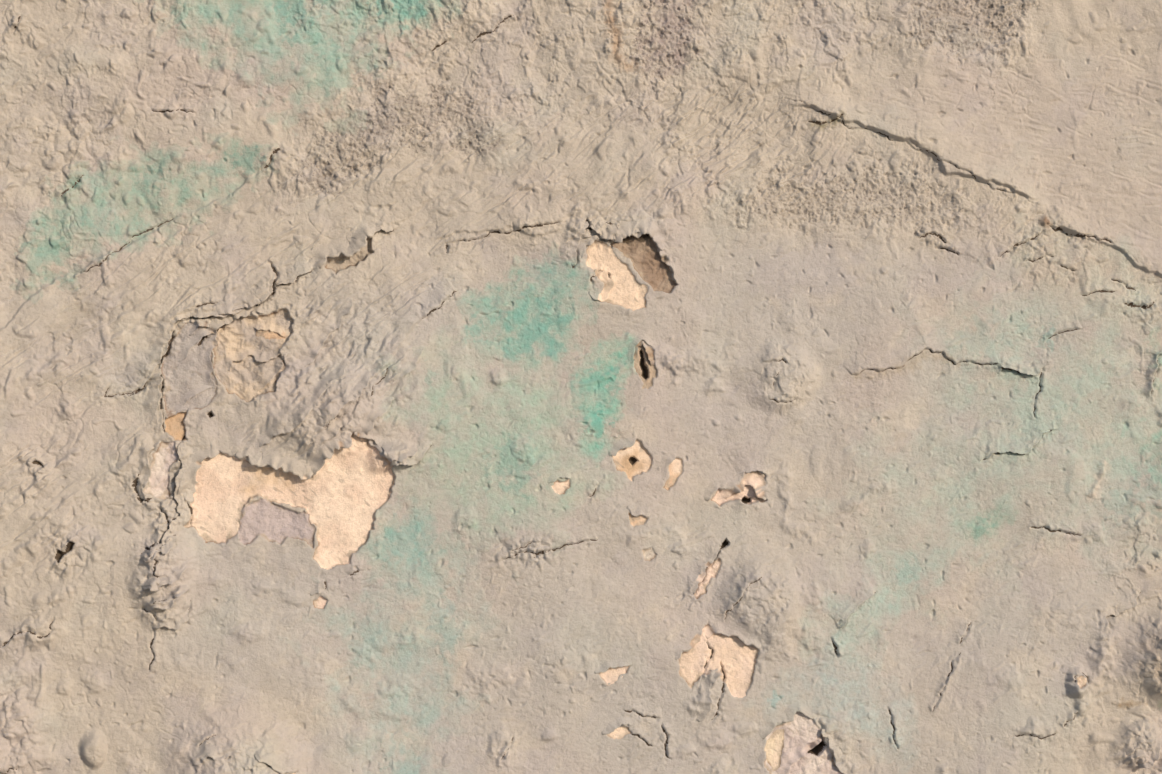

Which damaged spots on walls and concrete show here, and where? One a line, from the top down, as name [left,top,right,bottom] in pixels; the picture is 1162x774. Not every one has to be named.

crack [801,101,893,141]
crack [84,219,173,272]
crack [446,219,649,281]
flaking render [573,217,681,311]
crack [920,233,959,255]
flaking render [137,287,395,570]
crack [324,368,388,427]
crack [860,329,1077,417]
flaking render [608,435,683,491]
flaking render [703,463,769,506]
flaking render [675,621,761,722]
flaking render [760,700,848,774]